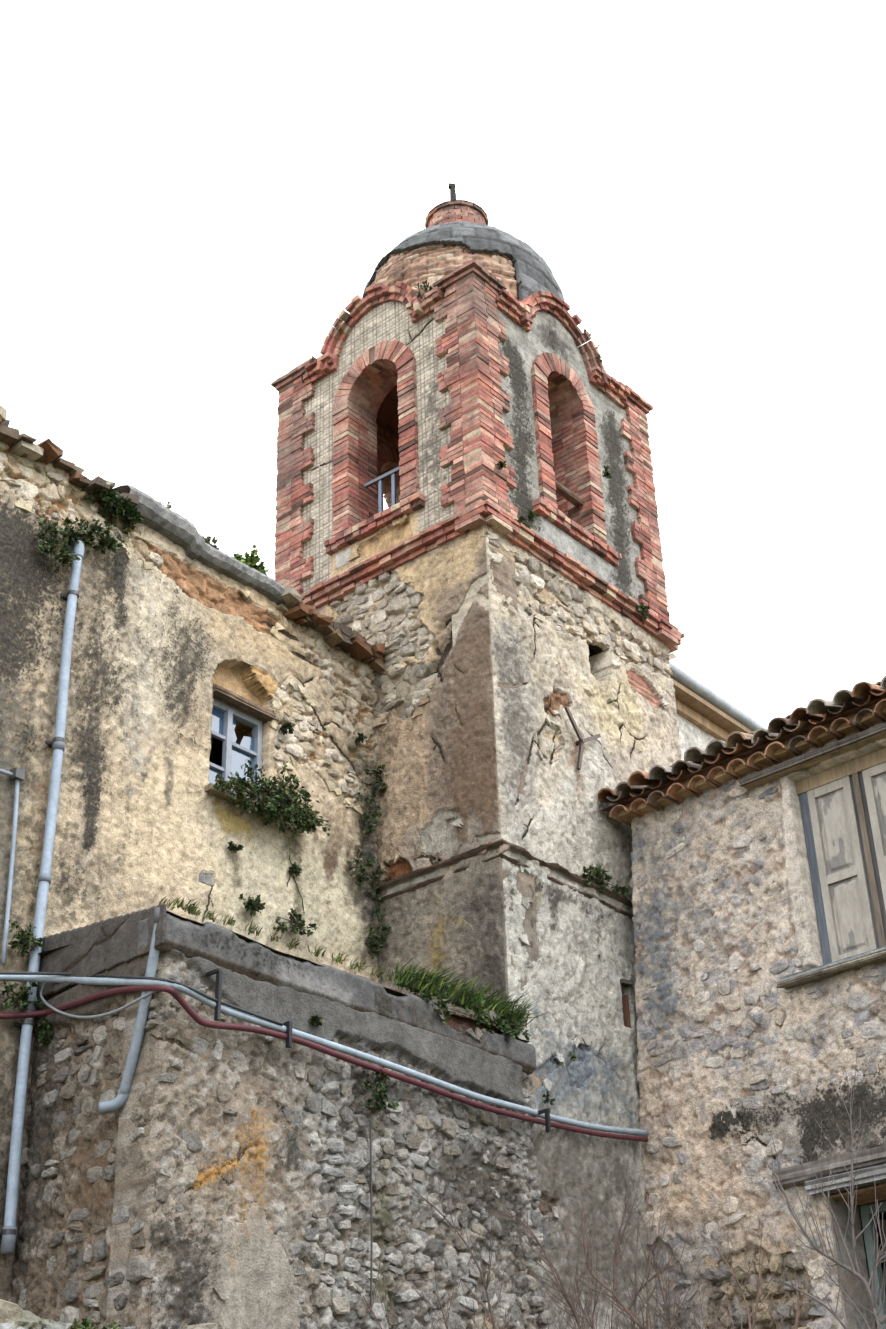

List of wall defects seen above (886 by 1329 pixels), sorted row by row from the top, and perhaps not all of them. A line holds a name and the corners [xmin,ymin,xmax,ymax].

flaking render [0,405,440,731]
water stain [0,682,50,952]
water stain [82,774,102,849]
water stain [114,529,160,795]
water stain [164,742,173,806]
flaking render [241,661,363,815]
crack [507,603,645,839]
water stain [707,1110,744,1140]
water stain [800,1120,886,1164]